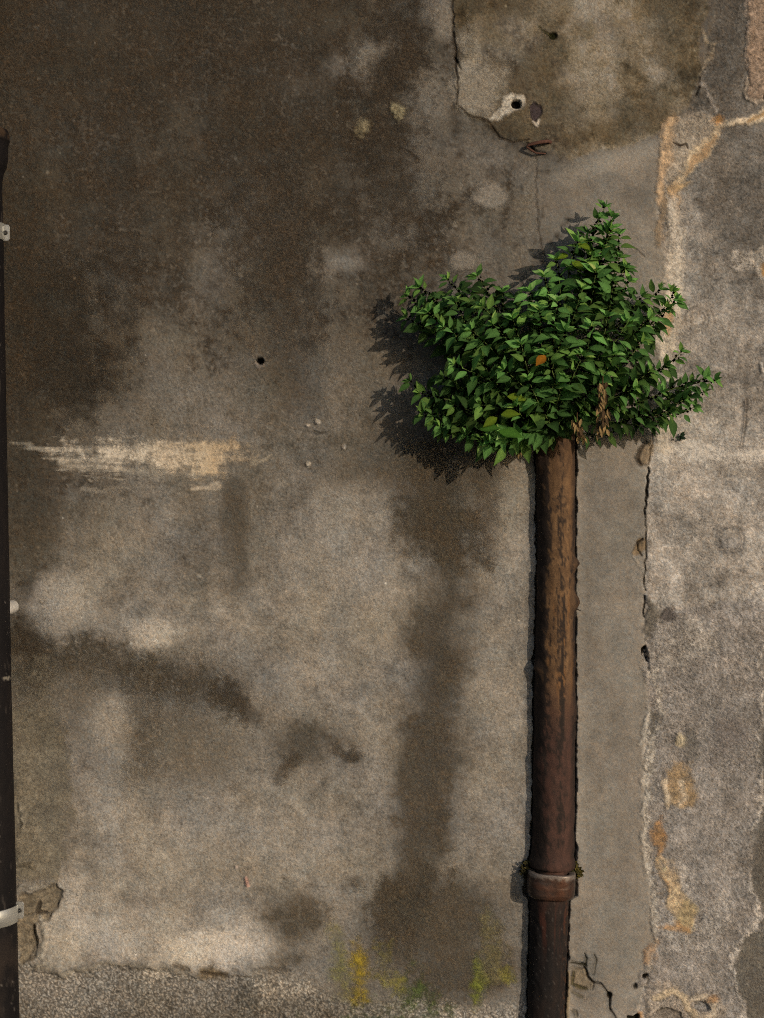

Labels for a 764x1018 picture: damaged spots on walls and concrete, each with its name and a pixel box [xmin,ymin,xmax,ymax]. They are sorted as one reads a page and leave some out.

crack [451,5,542,187]
spalling [454,57,542,127]
peeling [28,438,270,490]
crack [642,457,650,611]
peeling [627,0,764,1018]
crack [641,646,650,670]
leakage [11,617,251,886]
leakage [372,443,515,1005]
spalling [17,884,186,977]
spalling [199,968,227,978]
crack [571,954,612,1010]